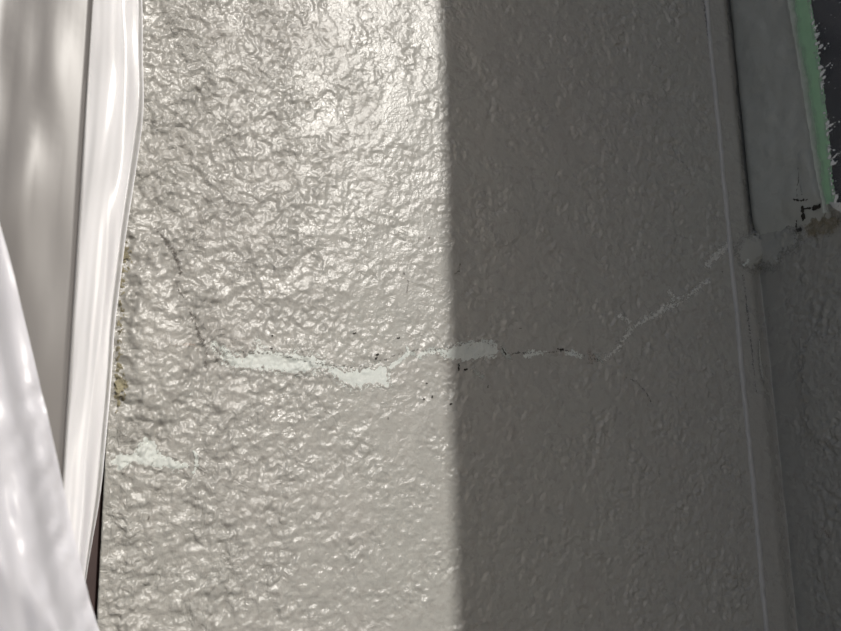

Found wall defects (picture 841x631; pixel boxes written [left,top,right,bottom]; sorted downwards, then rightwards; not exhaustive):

crack [243,241,729,368]
peeling [209,332,511,394]
peeling [105,428,199,481]